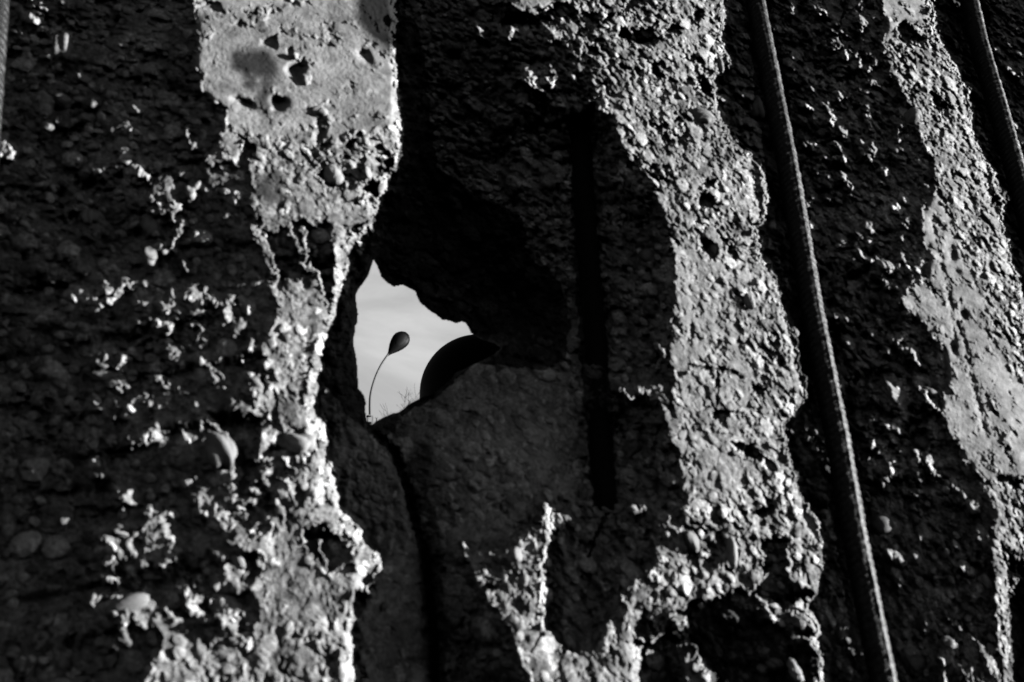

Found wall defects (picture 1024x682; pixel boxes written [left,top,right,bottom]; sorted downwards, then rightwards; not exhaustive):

spalling [0,0,643,682]
spalling [551,0,898,682]
spalling [796,0,1024,502]